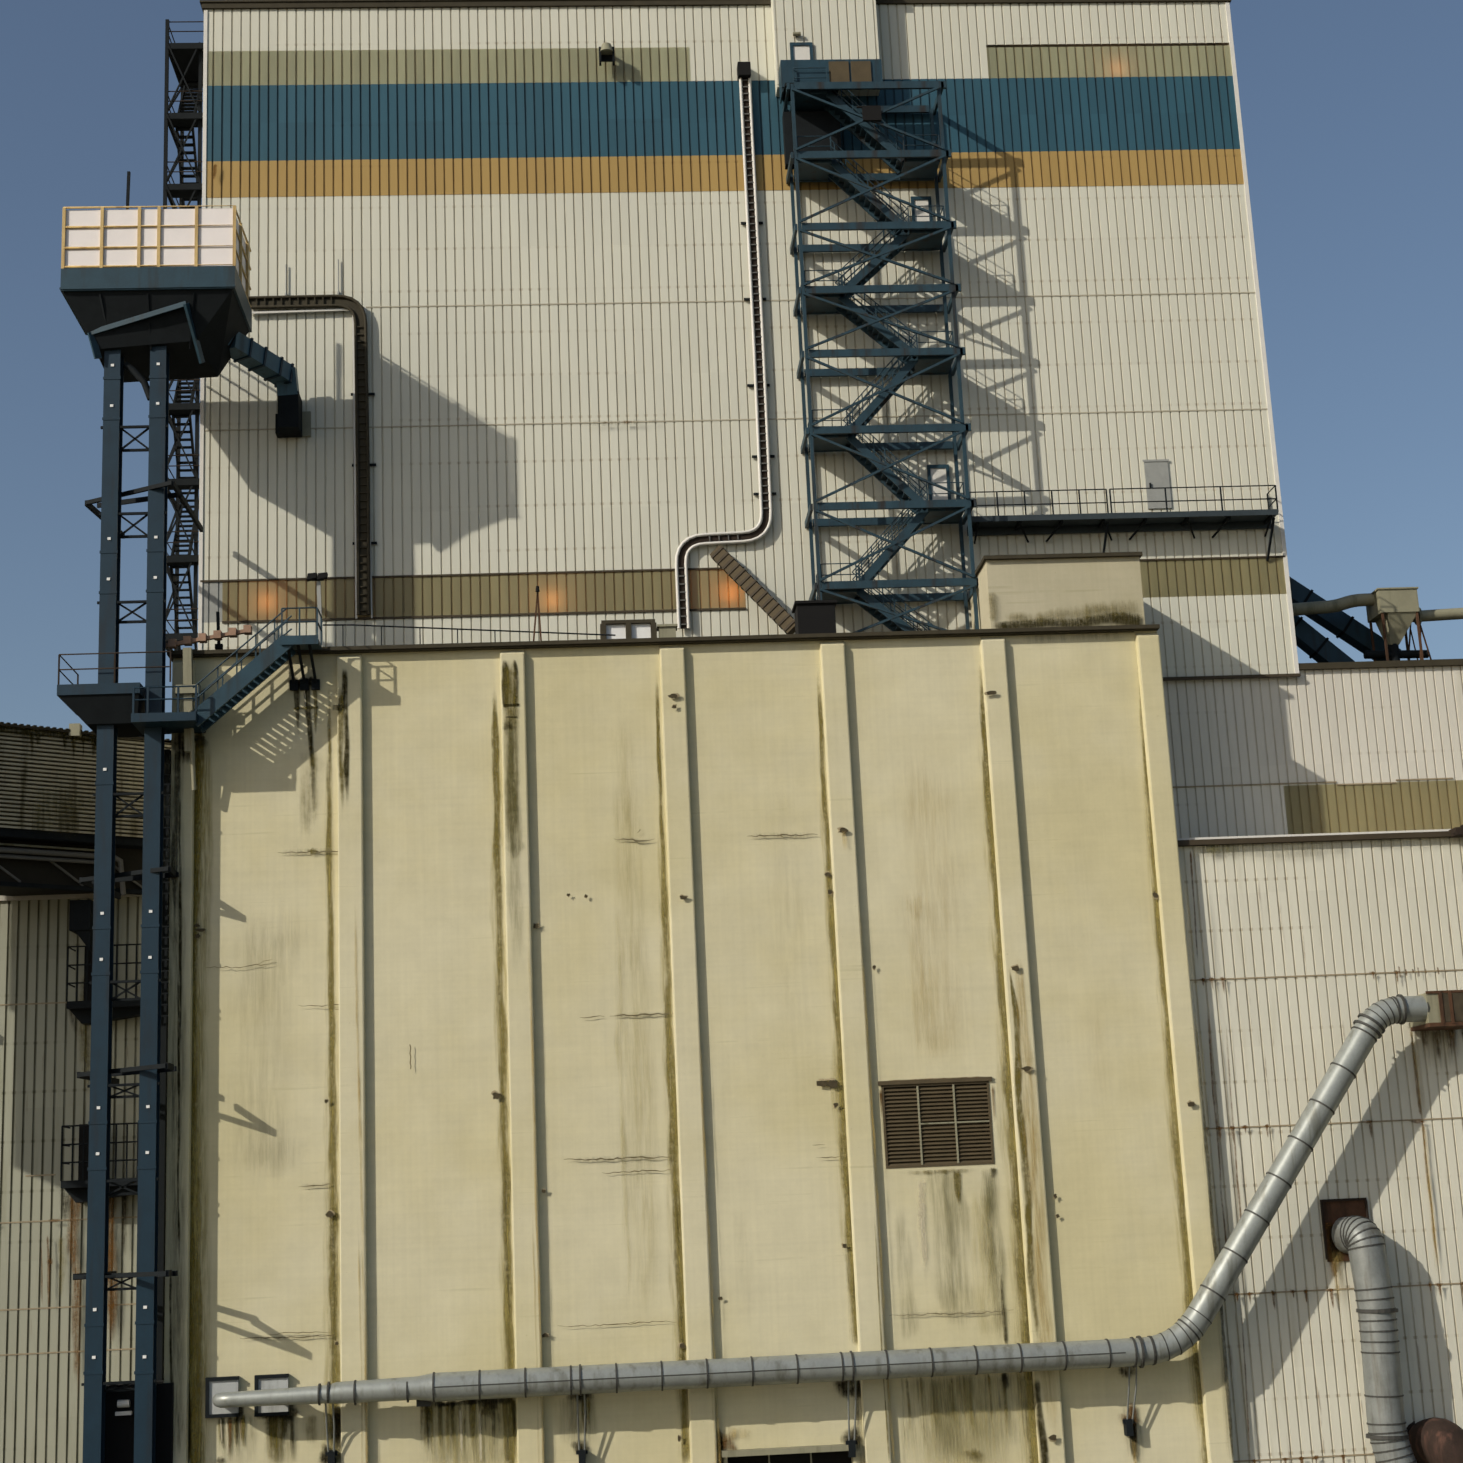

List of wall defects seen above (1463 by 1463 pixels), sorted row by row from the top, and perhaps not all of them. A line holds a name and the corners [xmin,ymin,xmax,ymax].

damp [169,736,341,1463]
damp [291,672,349,1383]
damp [421,1398,516,1463]
damp [492,661,519,1369]
damp [656,698,686,1361]
damp [818,696,858,1341]
damp [919,1170,961,1257]
damp [907,1372,1048,1463]
damp [981,687,1040,1344]
corrosion [1409,1023,1463,1252]